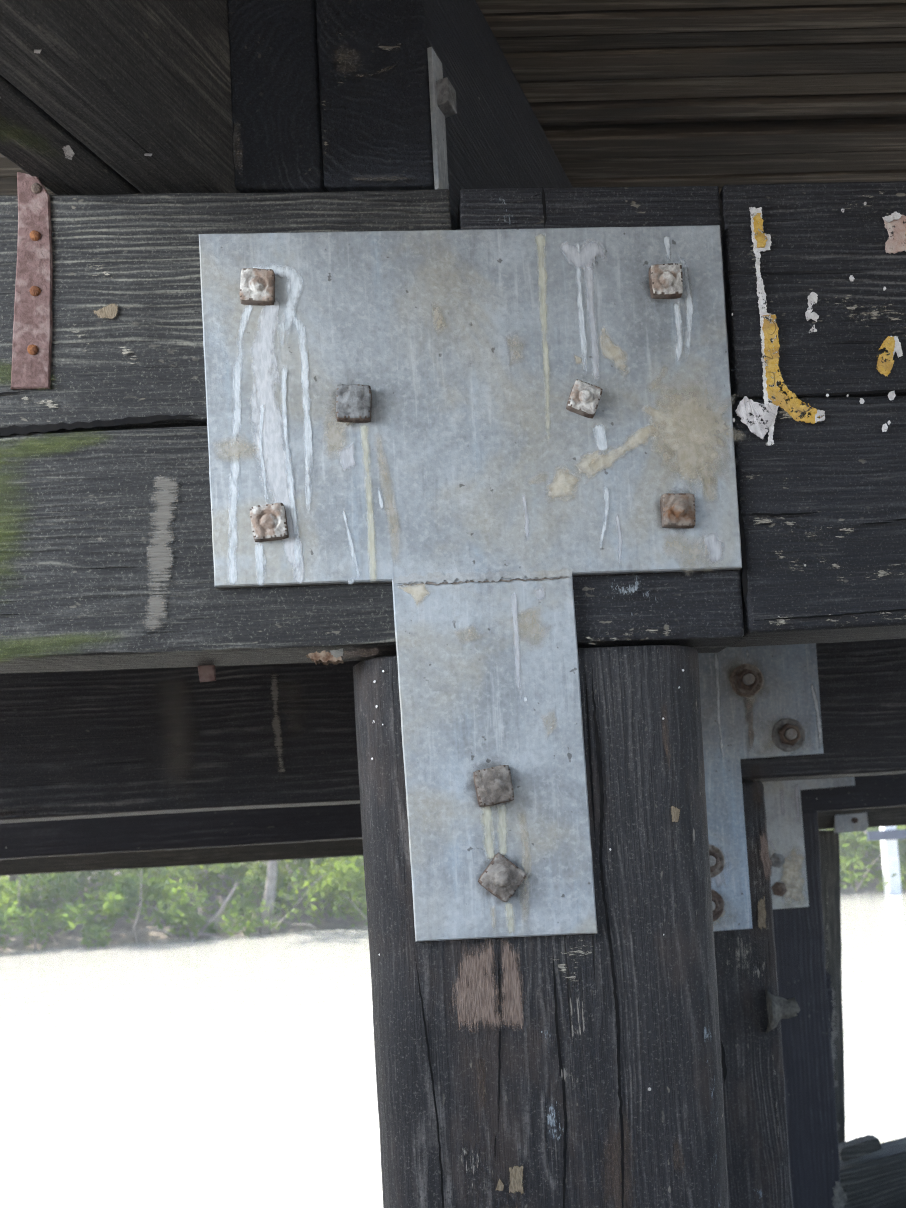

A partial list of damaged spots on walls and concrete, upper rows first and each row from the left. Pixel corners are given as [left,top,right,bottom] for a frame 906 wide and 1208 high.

leakage [228,265,313,584]
leakage [562,243,602,374]
peeling [733,207,829,446]
peeling [753,517,860,539]
peeling [882,212,906,254]
crack [413,944,444,1208]
crack [493,947,501,1157]